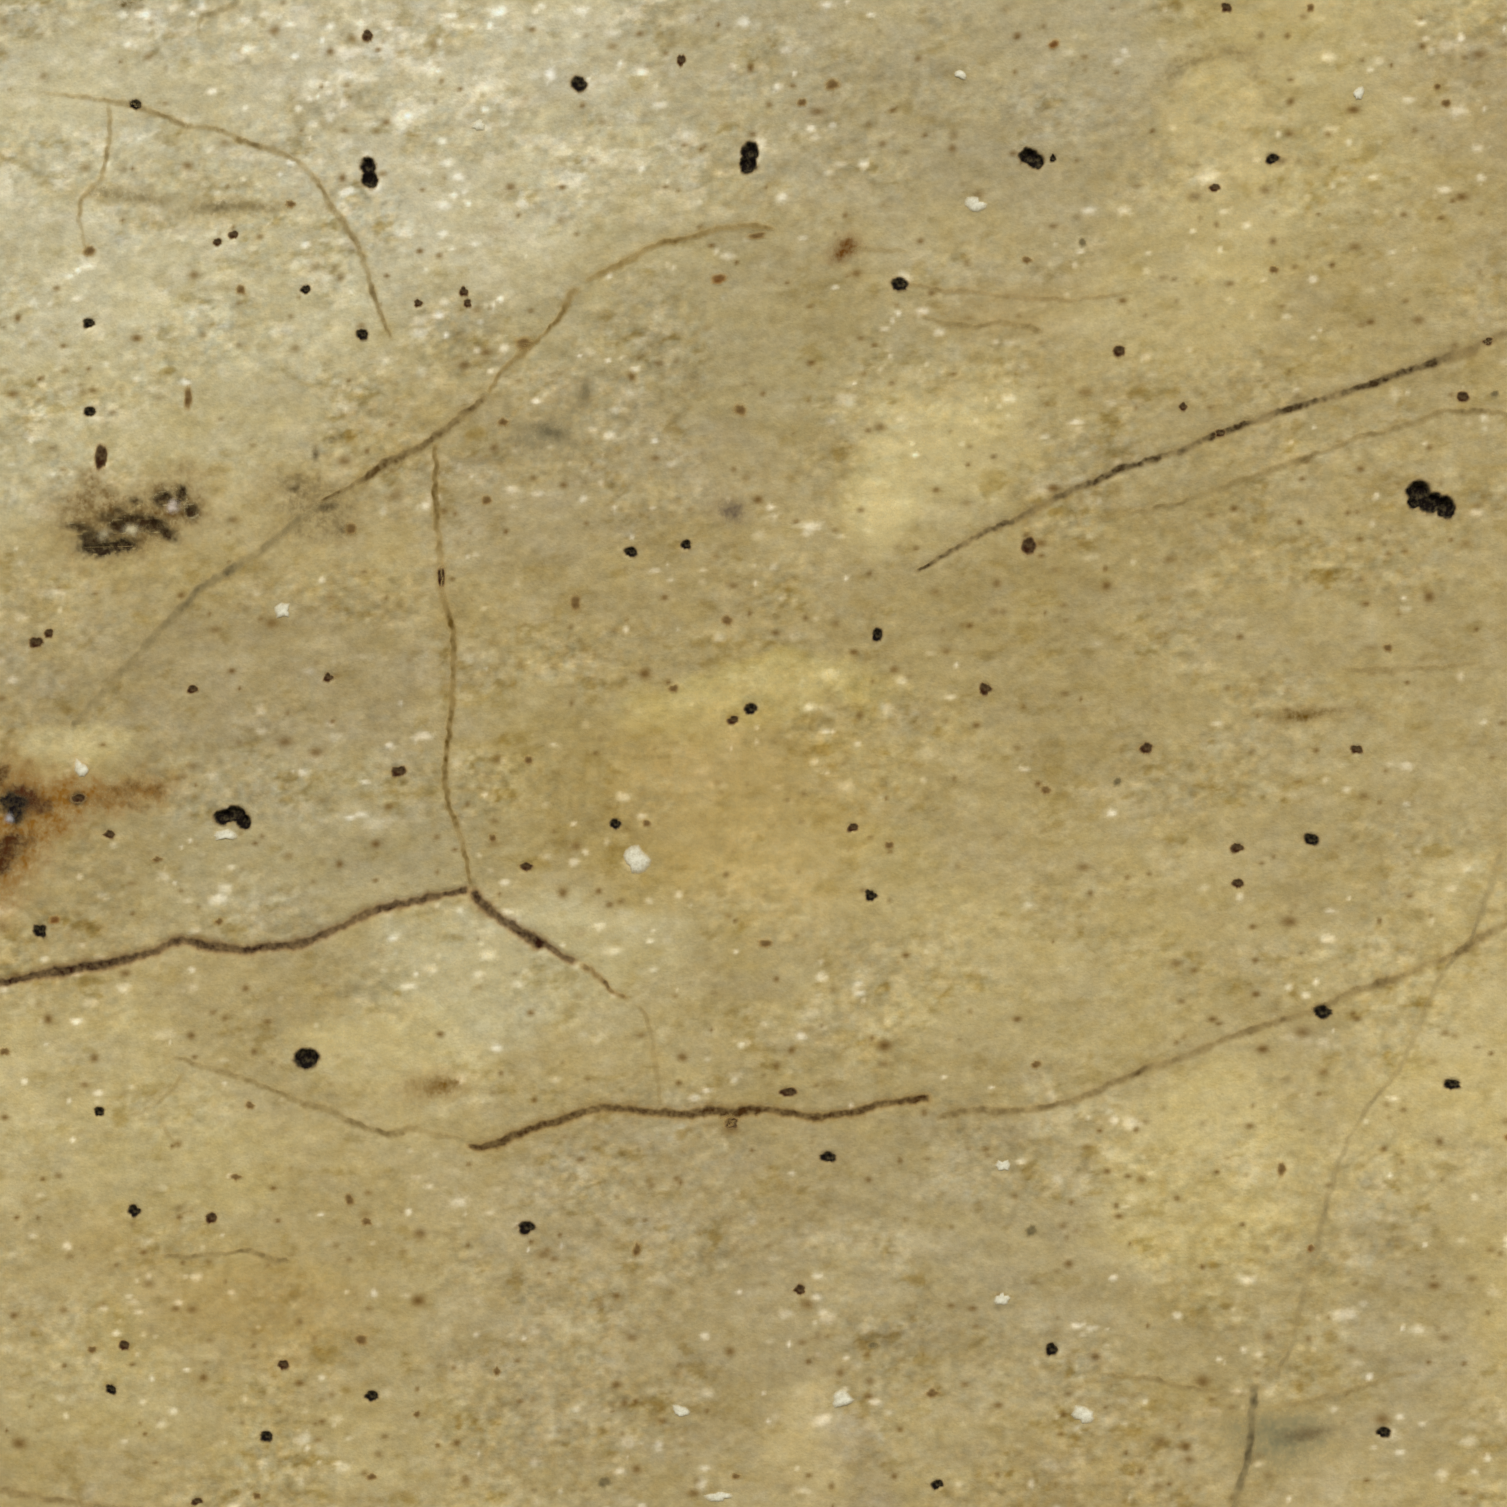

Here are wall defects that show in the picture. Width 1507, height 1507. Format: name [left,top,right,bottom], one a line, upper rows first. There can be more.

crack [933,287,1049,332]
crack [917,332,1507,571]
crack [0,222,771,1010]
corrosion [0,764,164,905]
crack [179,1057,402,1137]
crack [468,927,1493,1151]